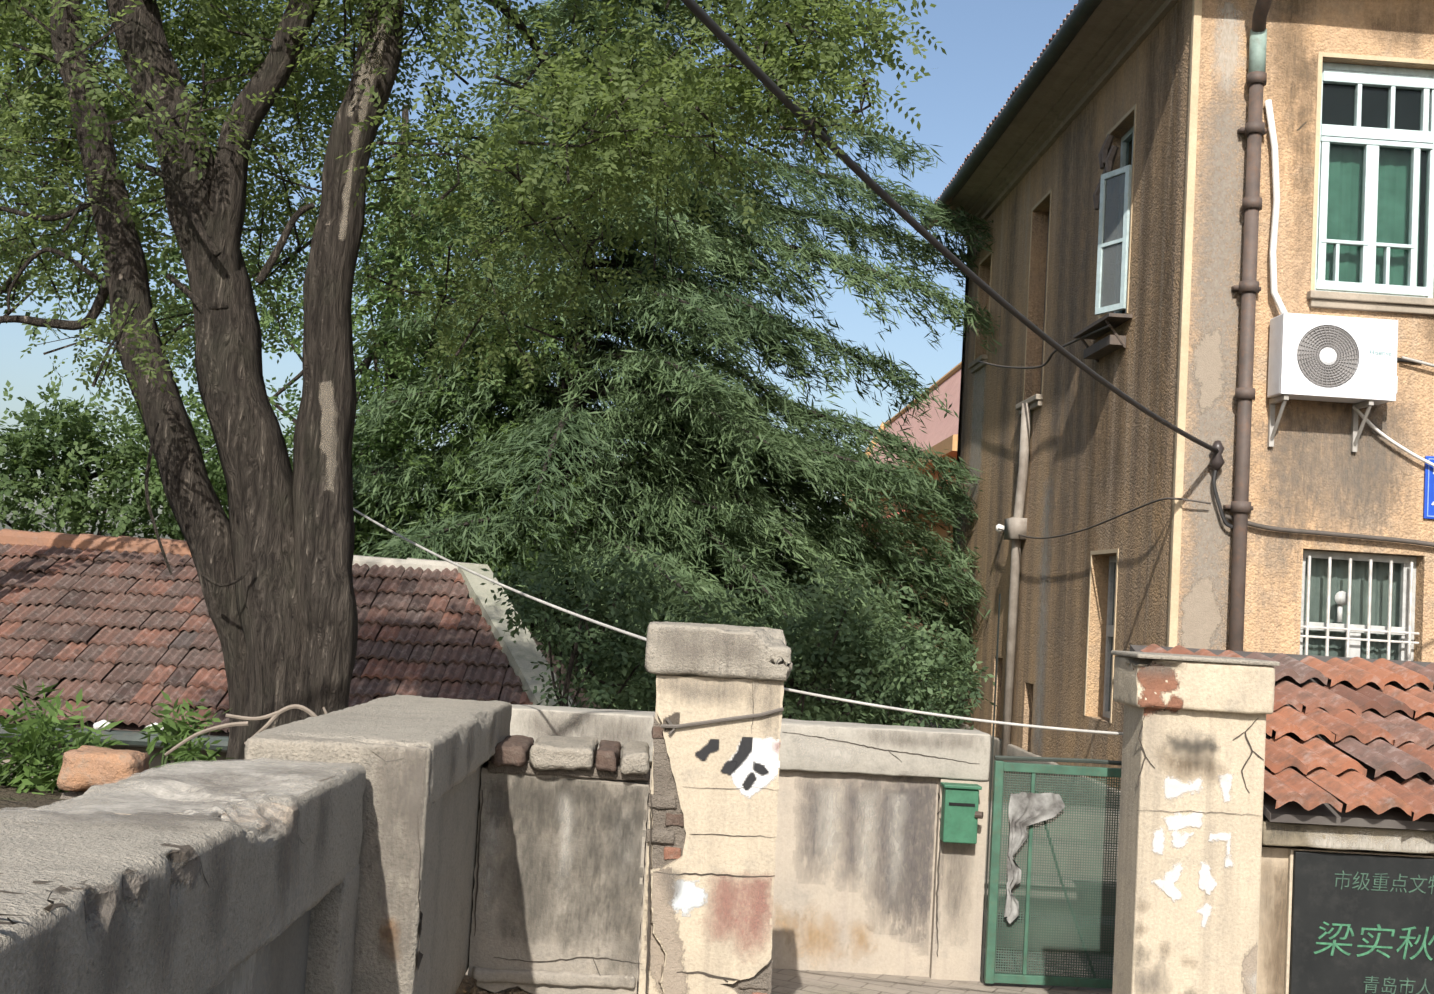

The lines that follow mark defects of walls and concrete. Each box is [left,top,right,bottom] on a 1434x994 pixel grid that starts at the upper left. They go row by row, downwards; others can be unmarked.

crack [1137,716,1264,816]
spalling [0,867,149,923]
spalling [160,843,201,889]
leakage [534,790,643,955]
spalling [644,712,689,994]
leakage [806,785,963,914]
spalling [725,960,773,994]